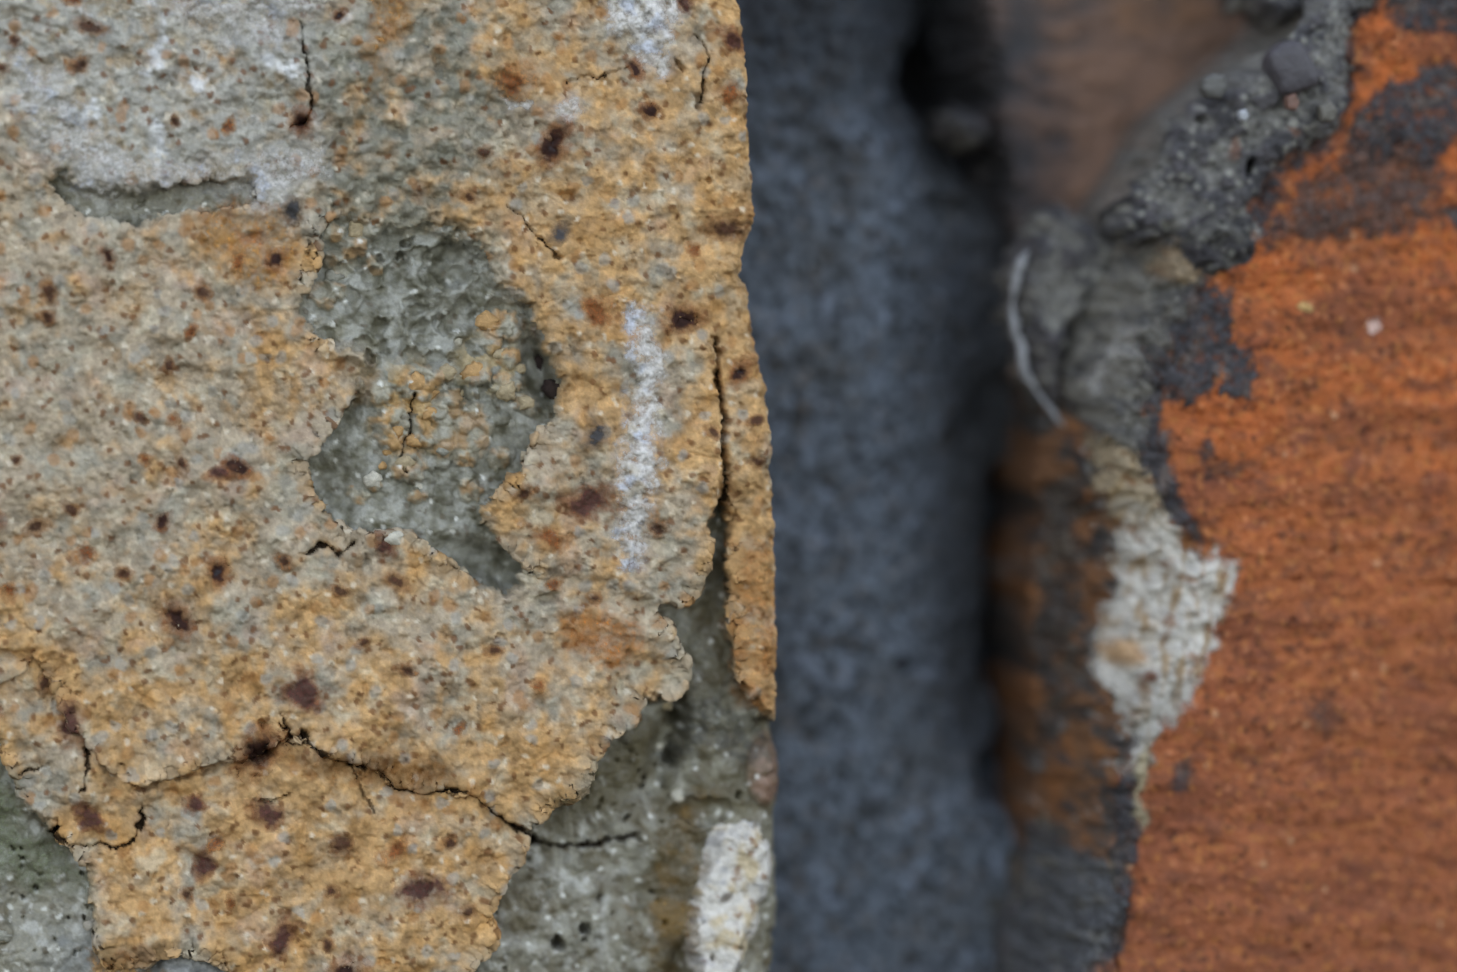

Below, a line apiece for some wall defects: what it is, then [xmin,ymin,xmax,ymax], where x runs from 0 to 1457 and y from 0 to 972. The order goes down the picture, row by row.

spalling [48,168,257,227]
crack [713,341,729,513]
peeling [0,211,779,972]
damp [1085,434,1239,826]
crack [79,748,91,793]
crack [49,807,146,850]
crack [280,717,637,848]